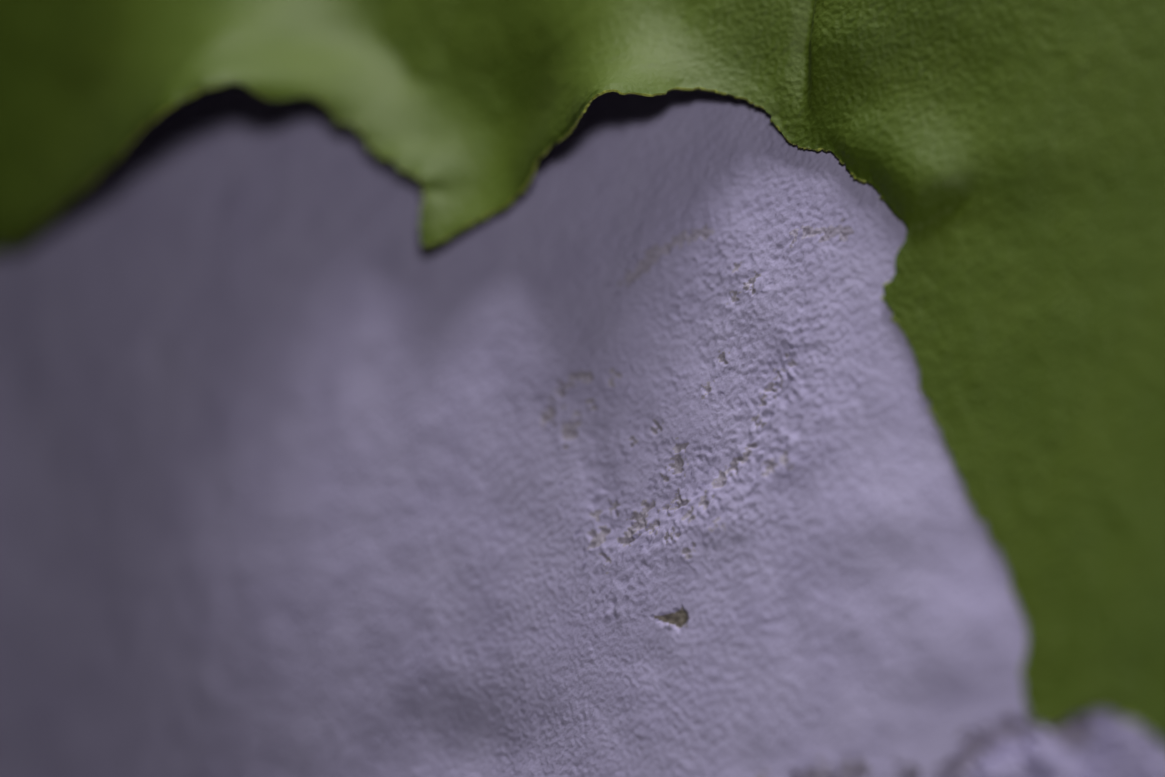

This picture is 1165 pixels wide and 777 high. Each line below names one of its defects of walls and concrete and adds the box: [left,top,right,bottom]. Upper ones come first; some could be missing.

peeling [0,0,944,248]
flaking render [580,343,807,579]
flaking render [717,251,770,315]
peeling [881,0,1165,777]
spalling [644,598,694,636]